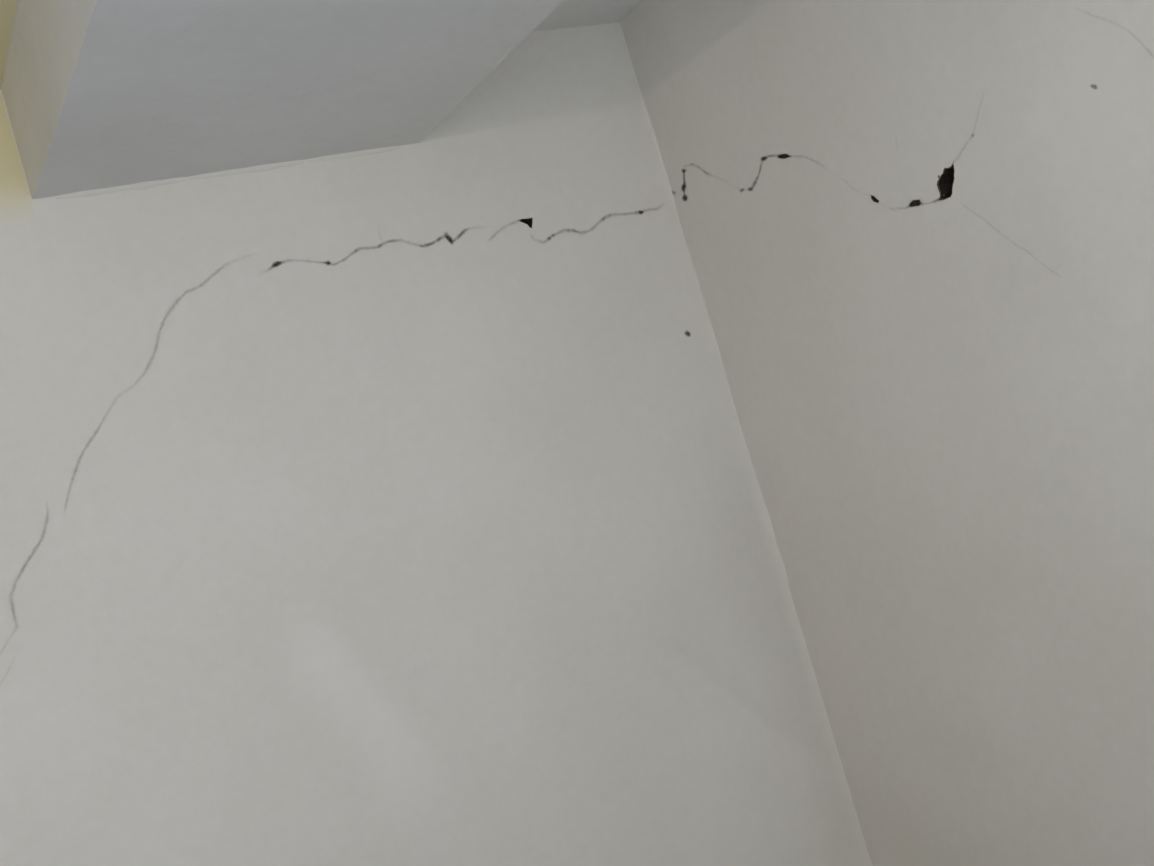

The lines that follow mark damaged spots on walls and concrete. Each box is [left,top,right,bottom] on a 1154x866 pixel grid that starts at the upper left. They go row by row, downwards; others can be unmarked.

crack [753,154,791,185]
crack [909,199,940,207]